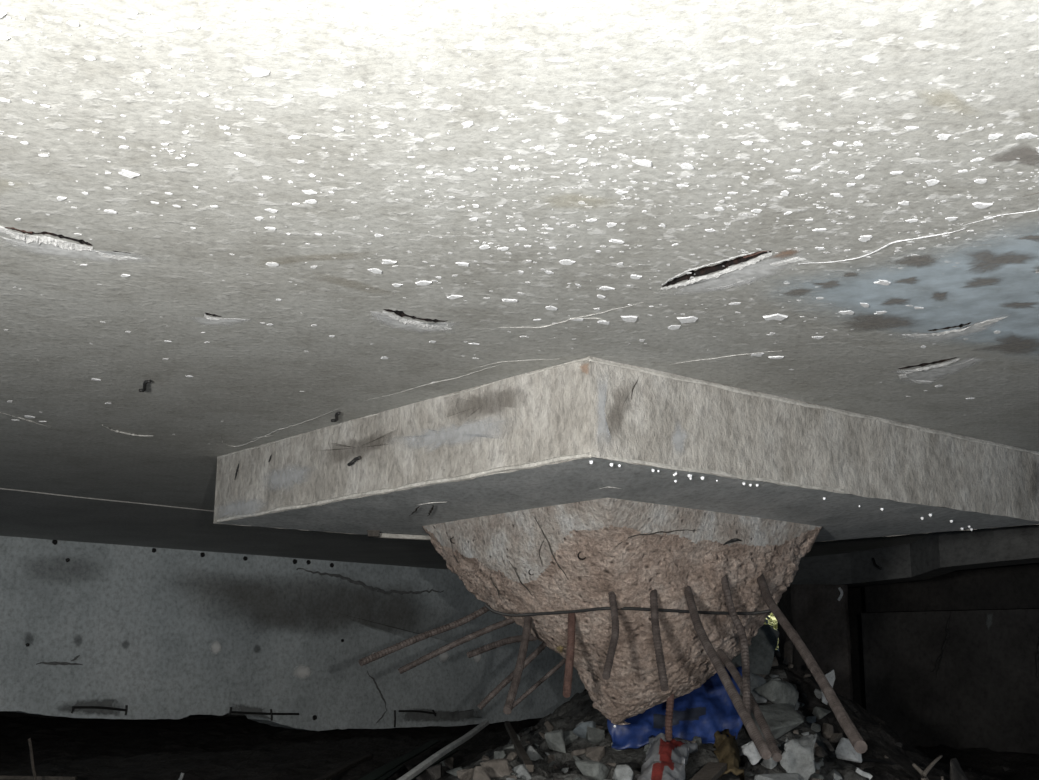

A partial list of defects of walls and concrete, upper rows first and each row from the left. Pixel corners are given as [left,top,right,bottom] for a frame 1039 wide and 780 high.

spalling [0,226,141,266]
peeling [660,202,1039,353]
spalling [370,309,451,343]
spalling [897,357,981,388]
spalling [394,642,547,727]
spalling [512,613,576,709]
spalling [602,591,619,680]
spalling [649,589,674,740]
spalling [684,575,782,762]
spalling [757,574,867,754]